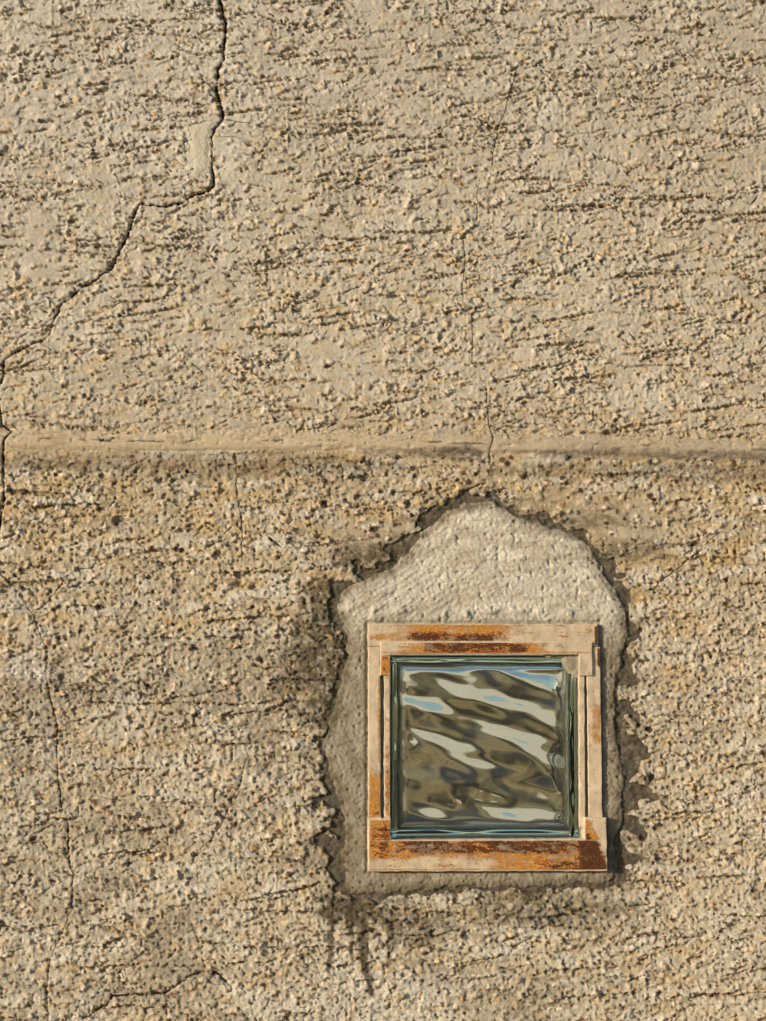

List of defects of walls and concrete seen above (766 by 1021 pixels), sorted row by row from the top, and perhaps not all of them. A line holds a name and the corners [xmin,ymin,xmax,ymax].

crack [0,0,255,527]
water stain [271,538,412,748]
corrosion [370,625,582,758]
crack [0,559,110,1015]
crack [201,761,245,848]
water stain [319,758,351,877]
corrosion [369,770,606,870]
crack [83,970,229,1018]
water stain [316,885,464,996]